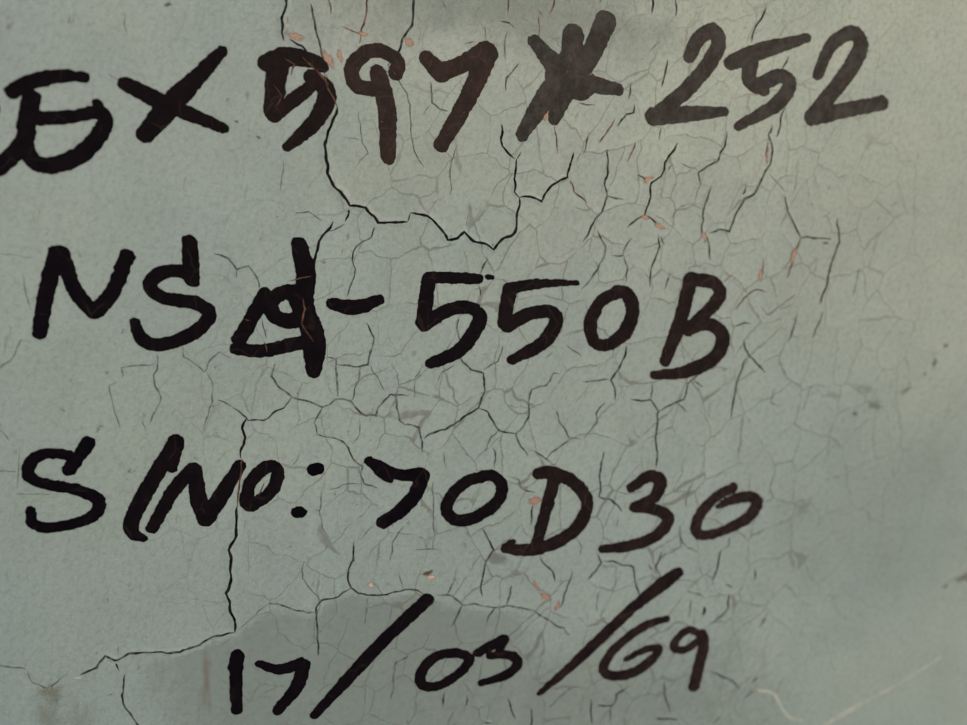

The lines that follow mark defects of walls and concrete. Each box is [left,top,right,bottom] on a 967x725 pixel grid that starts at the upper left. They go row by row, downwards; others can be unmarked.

crack [216,254,260,287]
crack [273,0,840,416]
crack [0,318,733,725]
crack [710,671,760,698]